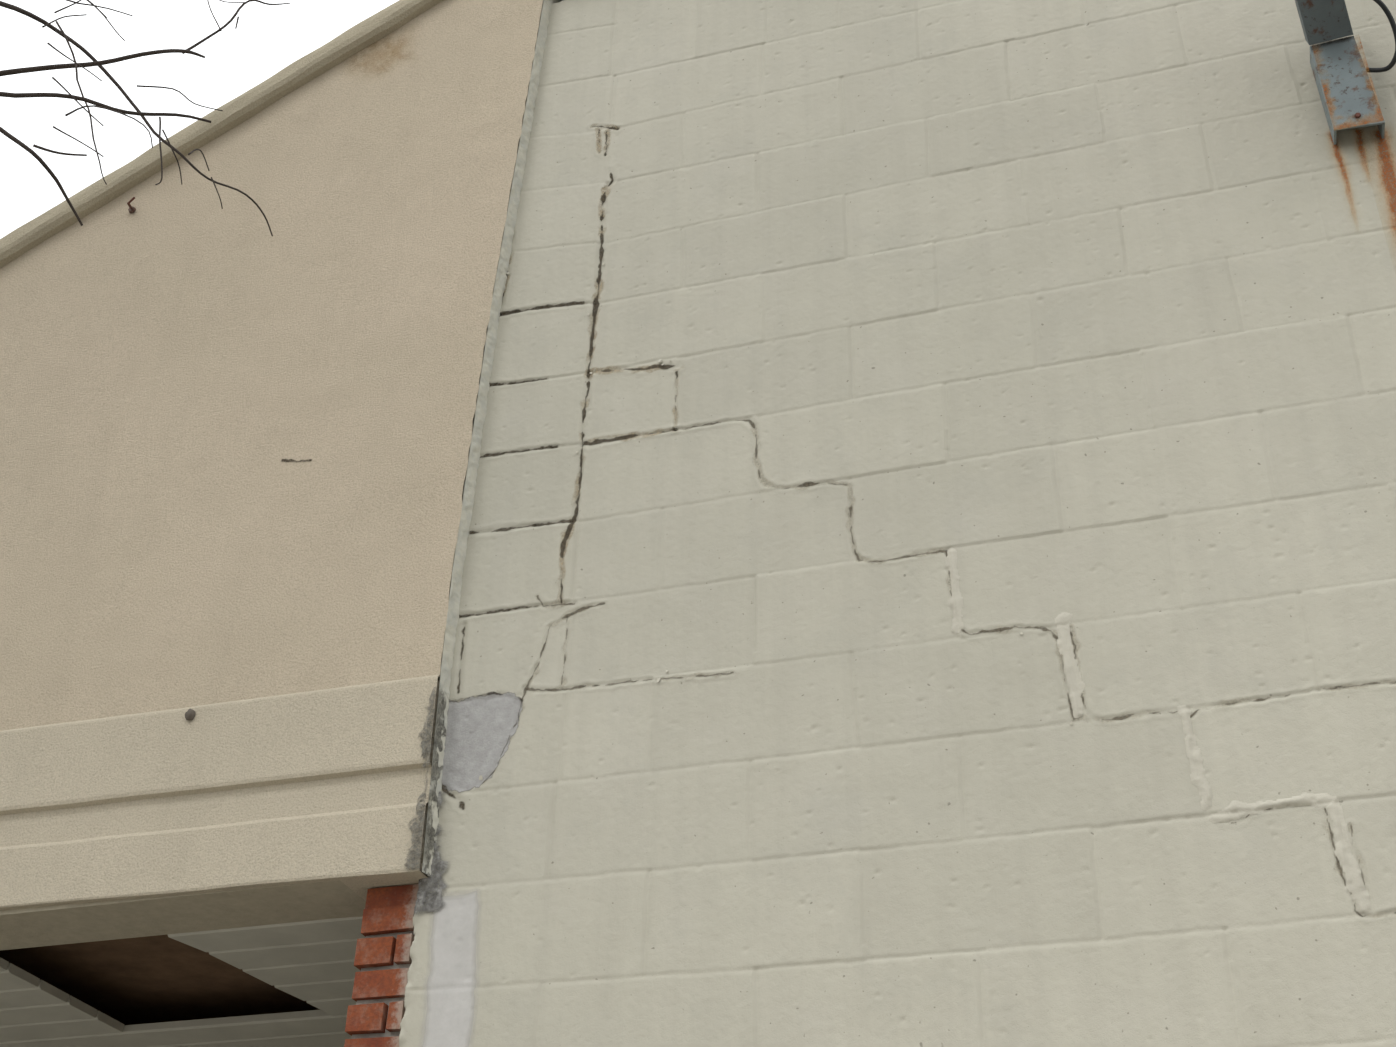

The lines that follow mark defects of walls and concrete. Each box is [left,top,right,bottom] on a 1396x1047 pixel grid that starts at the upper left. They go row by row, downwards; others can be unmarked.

corrosion [1323,40,1396,232]
crack [442,125,952,810]
peeling [405,687,523,914]
crack [962,625,1076,659]
crack [1068,695,1265,725]
crack [1325,809,1364,917]